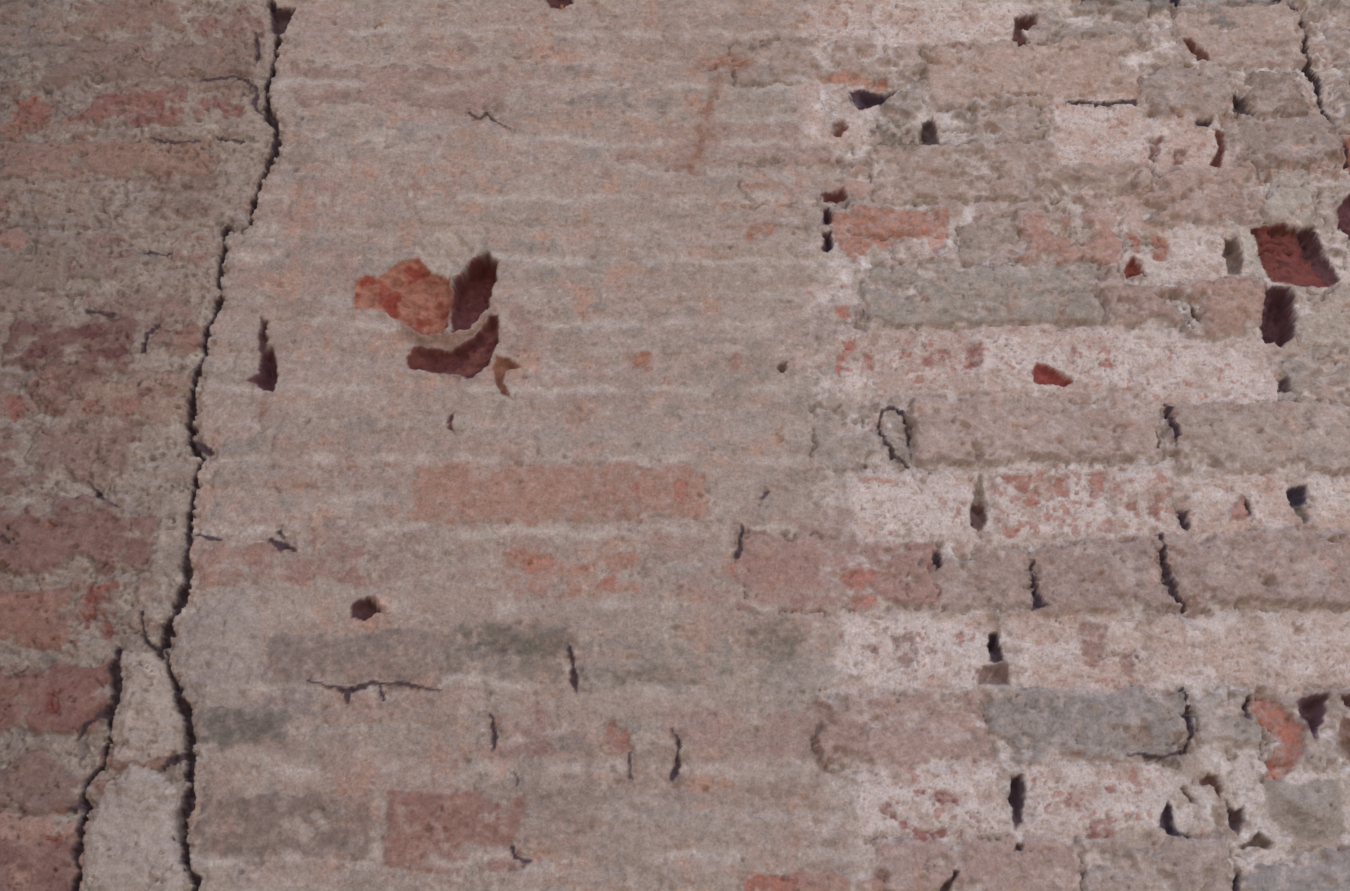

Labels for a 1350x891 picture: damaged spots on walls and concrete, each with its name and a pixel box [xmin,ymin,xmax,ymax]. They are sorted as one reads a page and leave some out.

spalling [544,0,575,11]
spalling [1334,136,1350,242]
spalling [1237,220,1342,291]
spalling [351,225,524,401]
crack [59,0,293,891]
spalling [349,593,393,622]
crack [305,673,445,708]
spalling [1246,691,1308,780]
spalling [1339,692,1350,709]